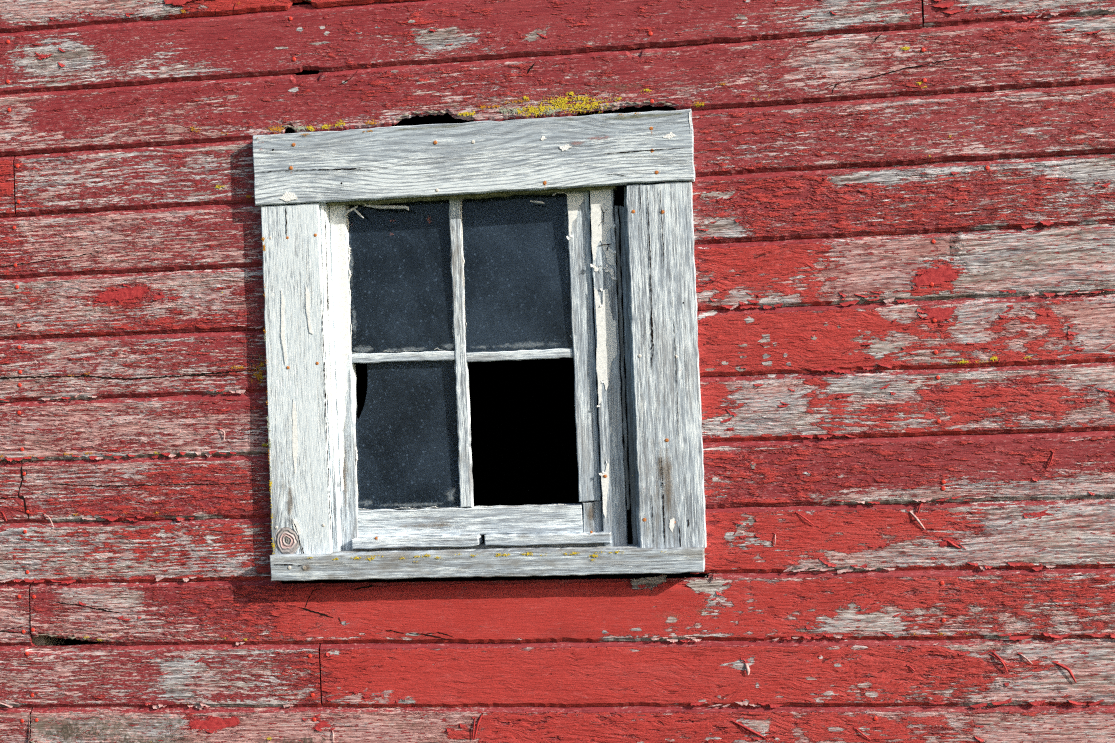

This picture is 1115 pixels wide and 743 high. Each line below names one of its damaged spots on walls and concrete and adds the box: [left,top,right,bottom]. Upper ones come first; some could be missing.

peeling [0,0,192,25]
peeling [932,0,1115,34]
peeling [823,169,898,187]
peeling [699,219,744,239]
peeling [530,189,617,407]
peeling [697,272,799,323]
peeling [811,221,1115,403]
crack [0,368,267,380]
crack [0,461,251,521]
peeling [784,450,1115,574]
peeling [755,604,907,667]
peeling [947,632,1115,743]